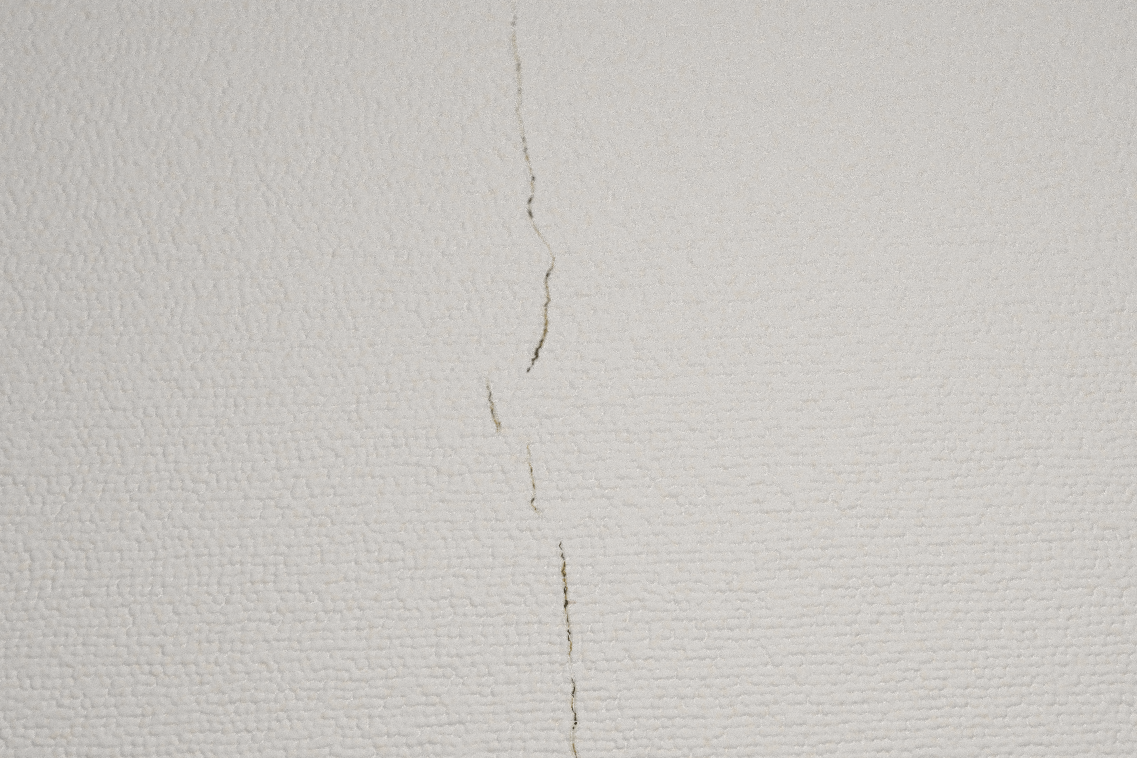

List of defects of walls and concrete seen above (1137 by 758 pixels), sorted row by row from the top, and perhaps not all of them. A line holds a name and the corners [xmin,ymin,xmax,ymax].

crack [512,3,555,373]
crack [487,385,501,432]
crack [527,446,539,513]
crack [559,542,577,758]